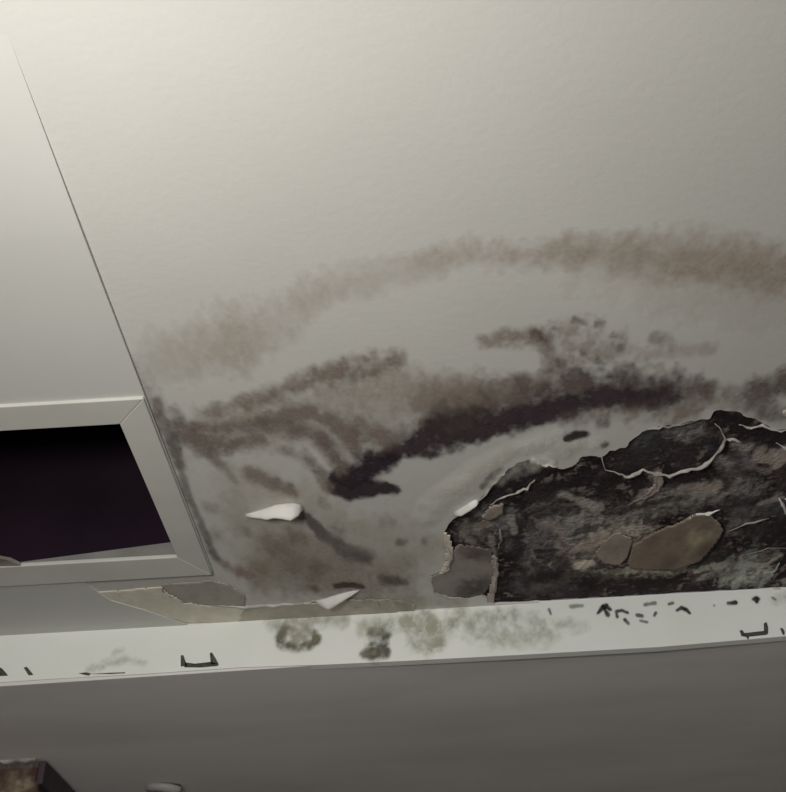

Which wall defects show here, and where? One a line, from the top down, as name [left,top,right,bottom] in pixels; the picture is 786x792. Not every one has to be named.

leakage [292,359,378,393]
leakage [153,369,702,501]
peeling [245,502,304,521]
spalling [430,410,786,603]
leakage [296,512,367,559]
leakage [305,565,402,592]
peeling [99,580,416,623]
leakage [597,603,657,624]
mould [276,617,321,650]
mould [360,628,390,659]
leakage [400,612,444,650]